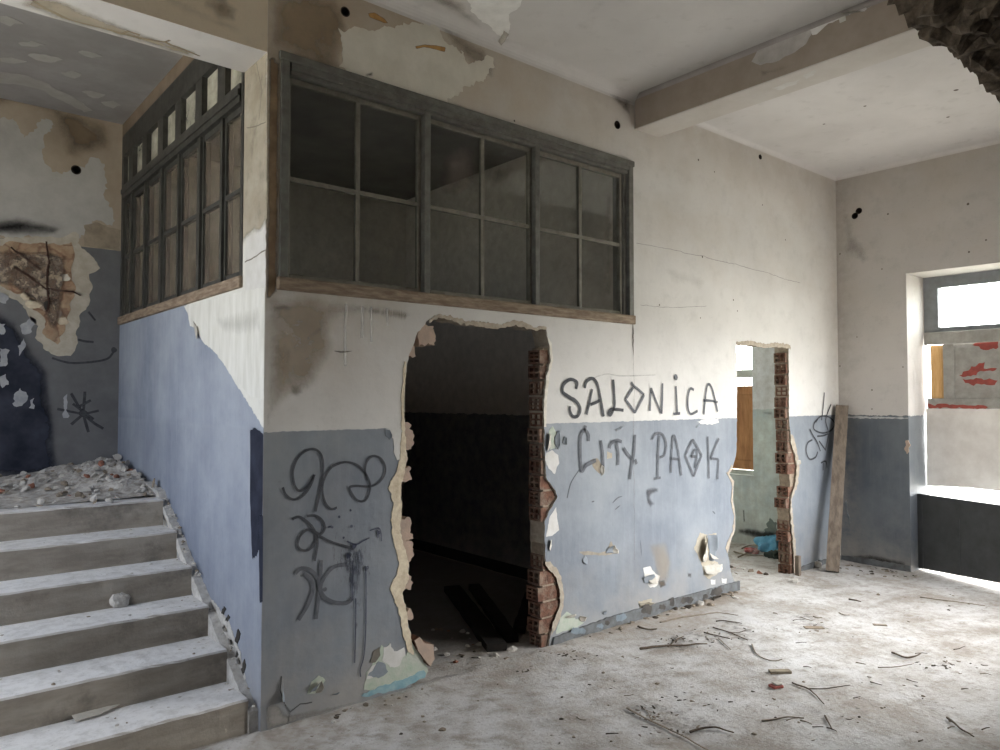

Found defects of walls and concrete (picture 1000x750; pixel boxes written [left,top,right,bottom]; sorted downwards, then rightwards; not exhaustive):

leakage [61,116,103,148]
leakage [29,0,194,136]
peeling [338,22,494,103]
peeling [751,7,869,65]
peeling [0,117,121,409]
flaking render [361,314,587,697]
peeling [638,465,735,615]